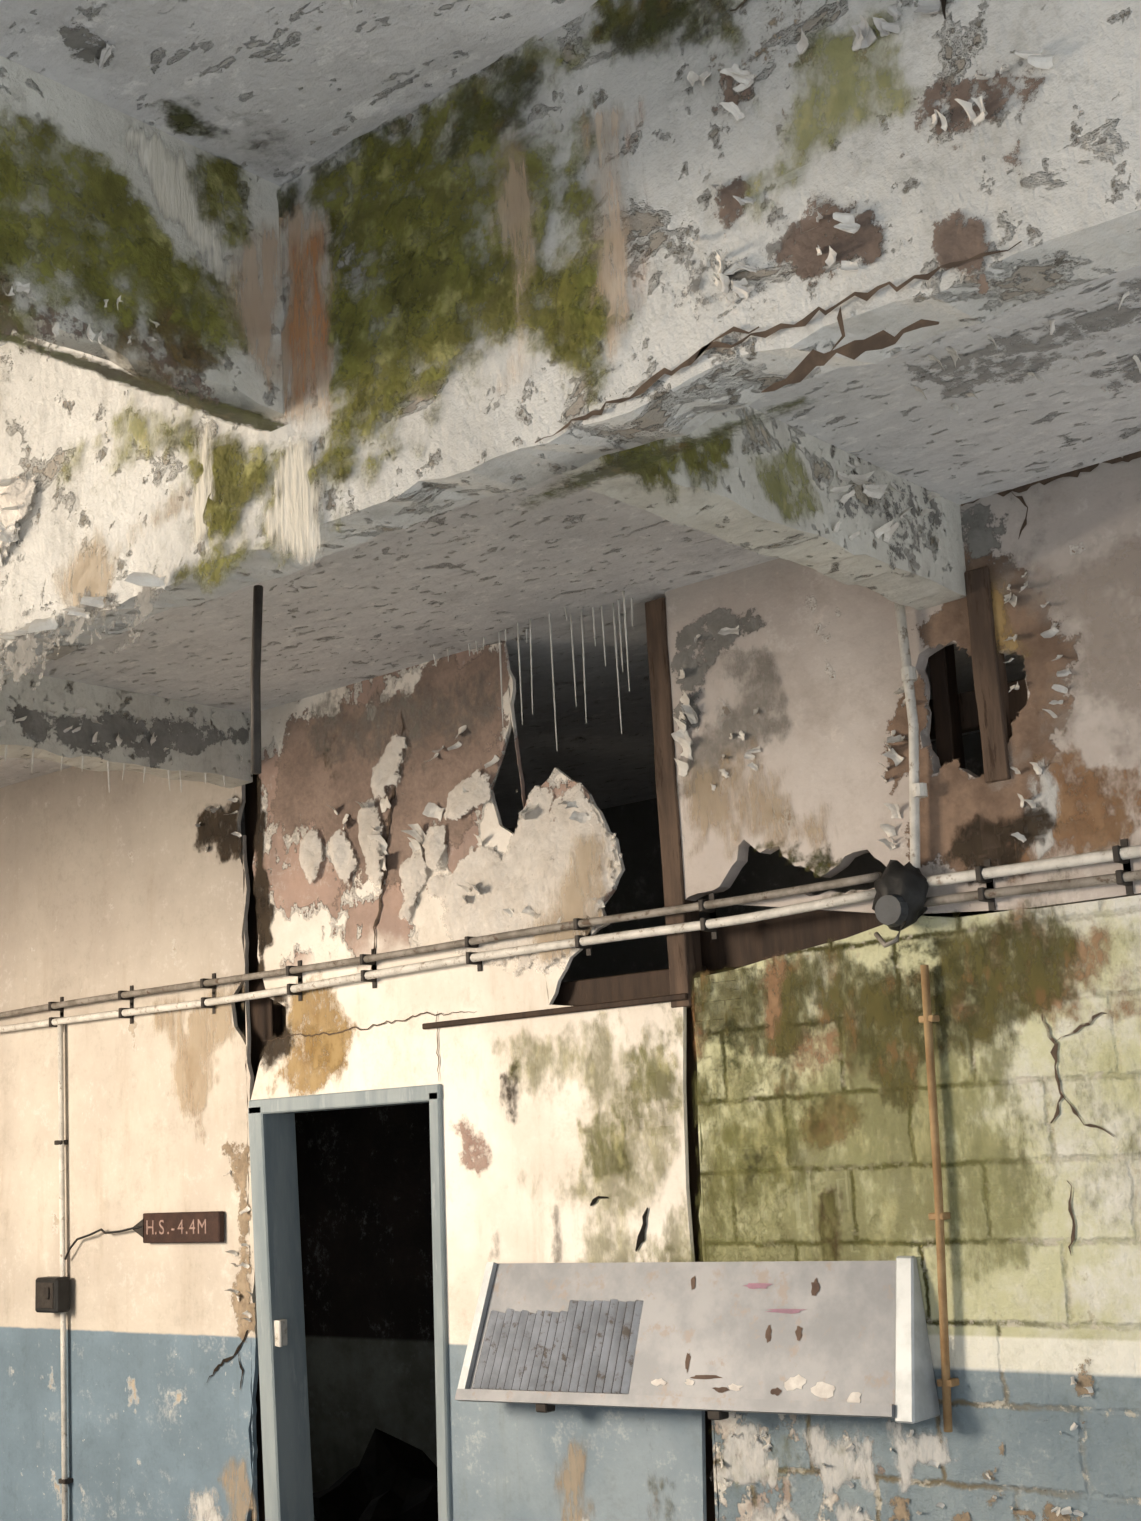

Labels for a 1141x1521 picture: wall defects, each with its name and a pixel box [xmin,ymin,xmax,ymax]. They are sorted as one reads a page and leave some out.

crack [940,0,948,19]
peeling [906,49,1054,150]
leakage [126,101,238,302]
peeling [673,191,887,320]
peeling [931,209,991,295]
crack [535,241,1022,443]
peeling [0,704,250,768]
peeling [878,504,1081,885]
peeling [267,642,622,976]
crack [1041,1012,1114,1137]
crack [1067,1181,1075,1256]
peeling [804,1421,972,1521]